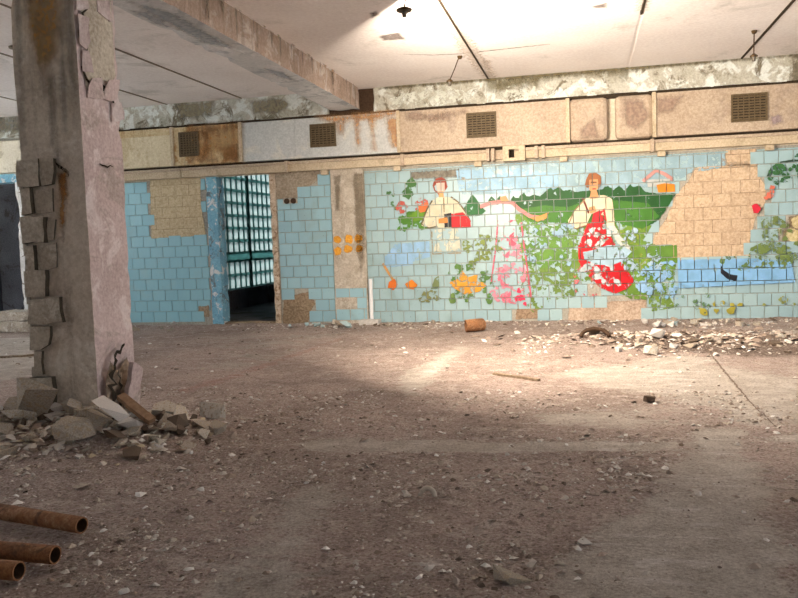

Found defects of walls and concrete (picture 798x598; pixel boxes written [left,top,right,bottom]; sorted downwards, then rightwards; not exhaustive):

corrosion [28,0,58,61]
peeling [653,148,766,261]
peeling [782,215,798,244]
peeling [282,292,315,324]
spalling [105,343,143,408]
crack [706,345,776,426]